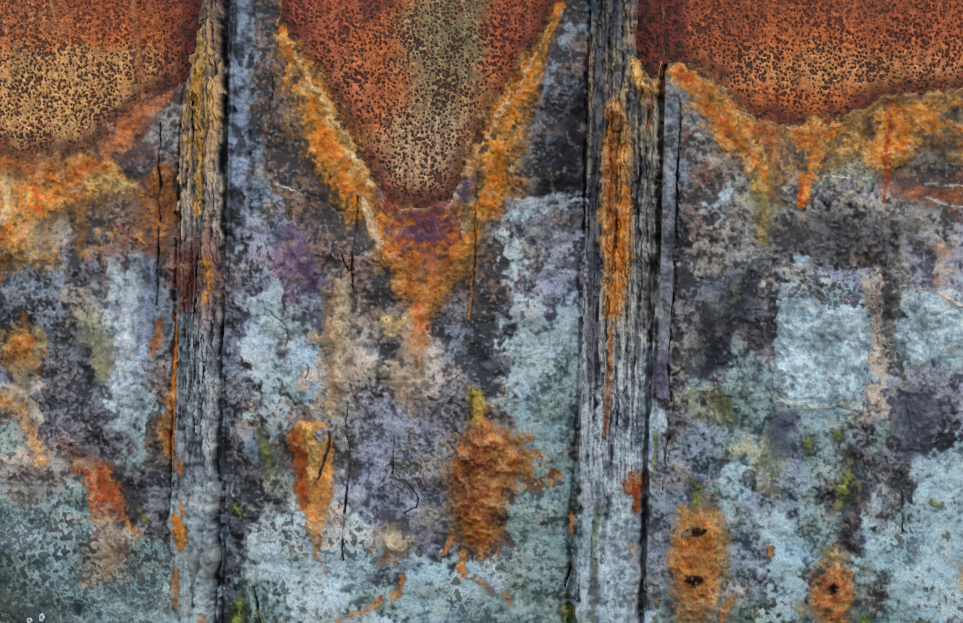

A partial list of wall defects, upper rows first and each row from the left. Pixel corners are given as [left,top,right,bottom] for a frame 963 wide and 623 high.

rust [0,27,208,283]
rust [200,256,213,303]
rust [270,0,566,403]
rust [598,99,635,435]
rust [630,58,963,243]
rust [0,361,49,470]
rust [150,309,185,476]
rust [63,448,138,580]
rust [171,567,179,610]
rust [171,499,189,552]